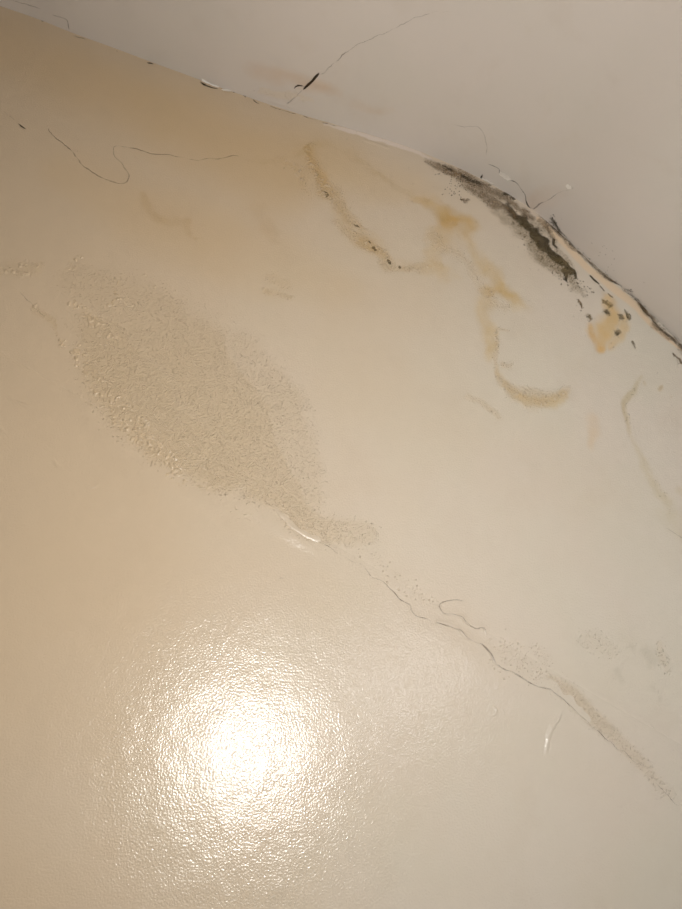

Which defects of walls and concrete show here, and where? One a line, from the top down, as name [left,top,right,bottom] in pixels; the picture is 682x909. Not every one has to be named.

crack [295,73,319,89]
leakage [430,162,682,365]
crack [274,509,321,542]
crack [432,603,607,740]